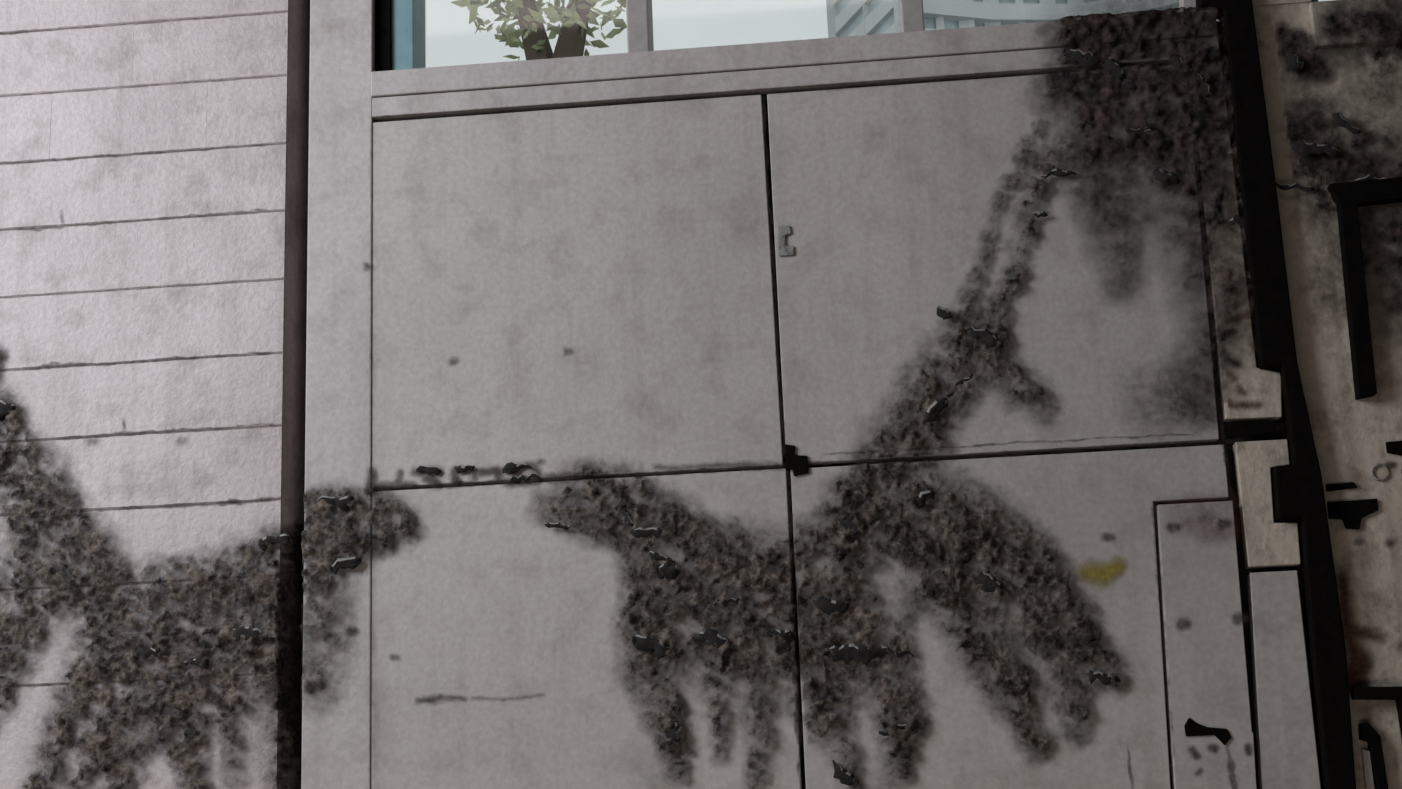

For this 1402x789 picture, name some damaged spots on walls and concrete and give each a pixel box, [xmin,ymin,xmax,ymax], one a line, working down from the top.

damp [0,391,416,789]
damp [535,7,1254,789]
damp [1275,0,1402,217]
damp [1359,202,1402,315]